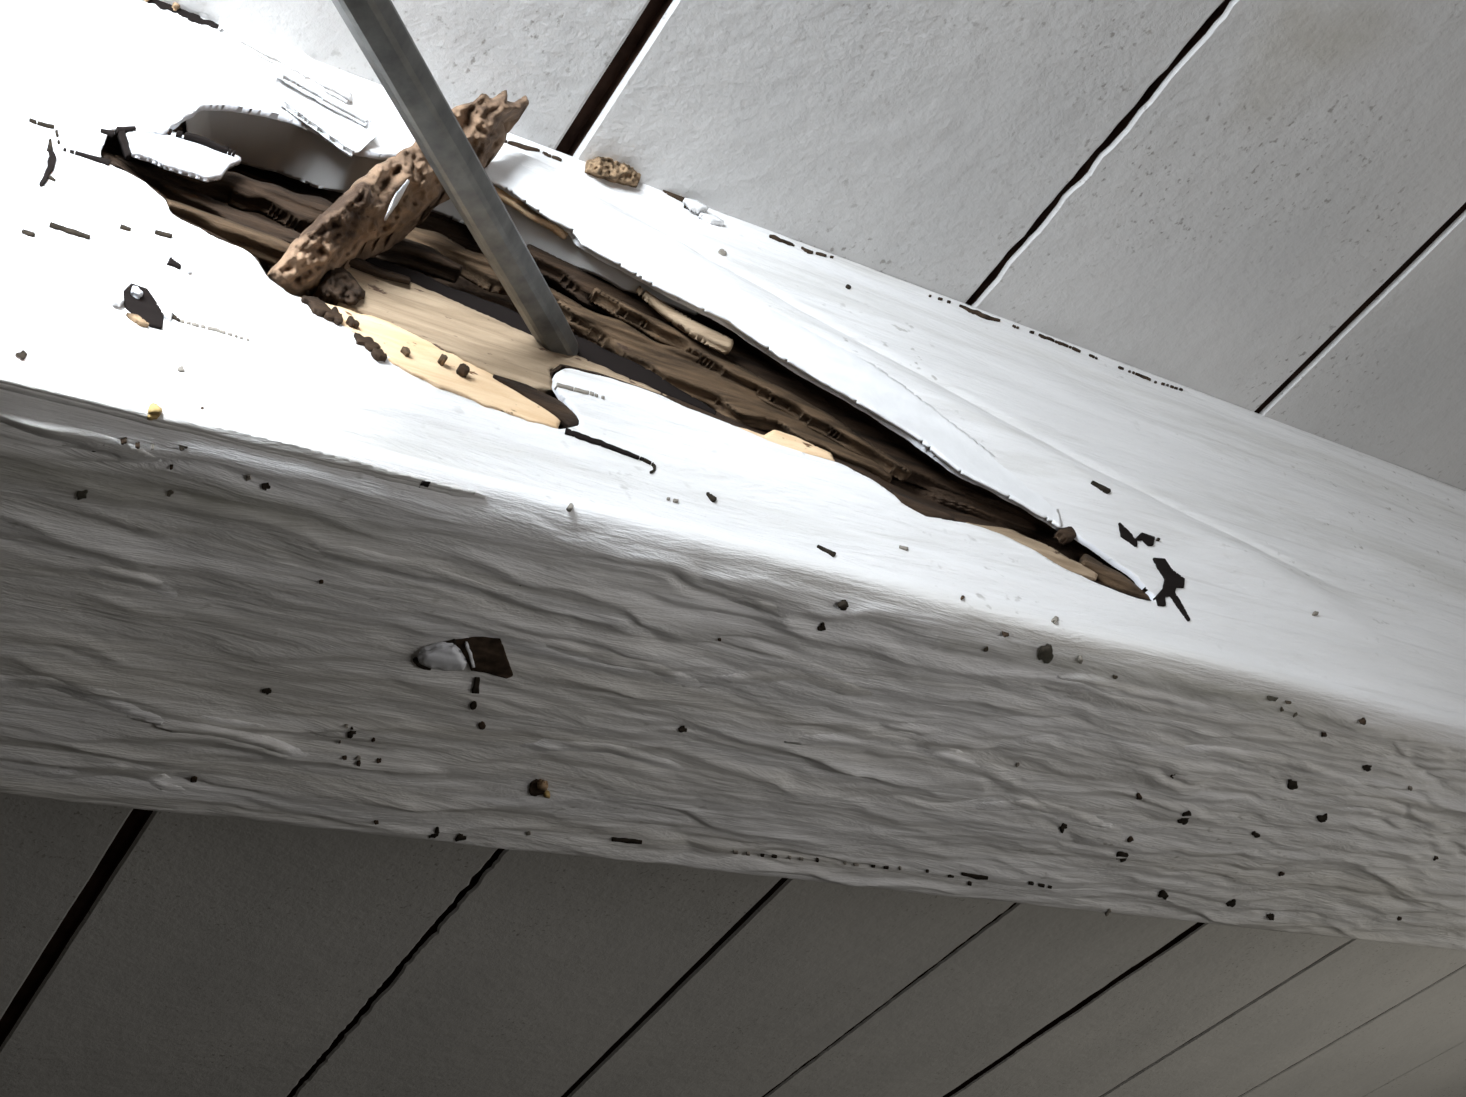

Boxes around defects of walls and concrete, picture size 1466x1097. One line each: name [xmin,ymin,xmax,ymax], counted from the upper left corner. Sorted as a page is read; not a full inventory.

spalling [63,22,386,275]
peeling [109,283,250,341]
crack [554,383,605,399]
spalling [288,149,1190,621]
crack [565,428,717,503]
peeling [413,637,513,679]